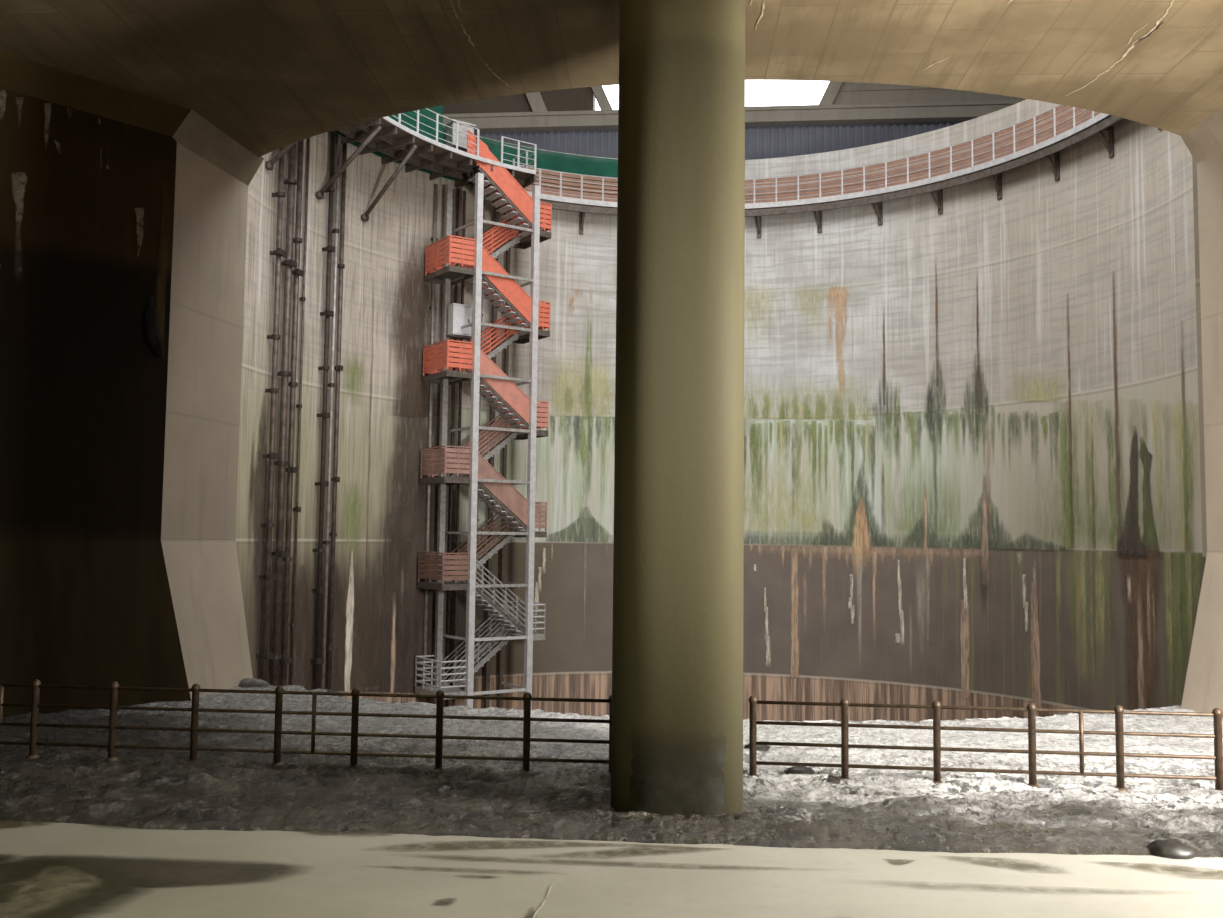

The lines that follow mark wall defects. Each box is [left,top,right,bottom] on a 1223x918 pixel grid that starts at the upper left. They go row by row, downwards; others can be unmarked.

crack [1066,0,1174,96]
peeling [11,172,27,221]
peeling [135,208,144,248]
leakage [250,253,467,693]
leakage [551,332,615,489]
rust [828,288,847,390]
leakage [744,286,1065,708]
leakage [1071,431,1191,710]